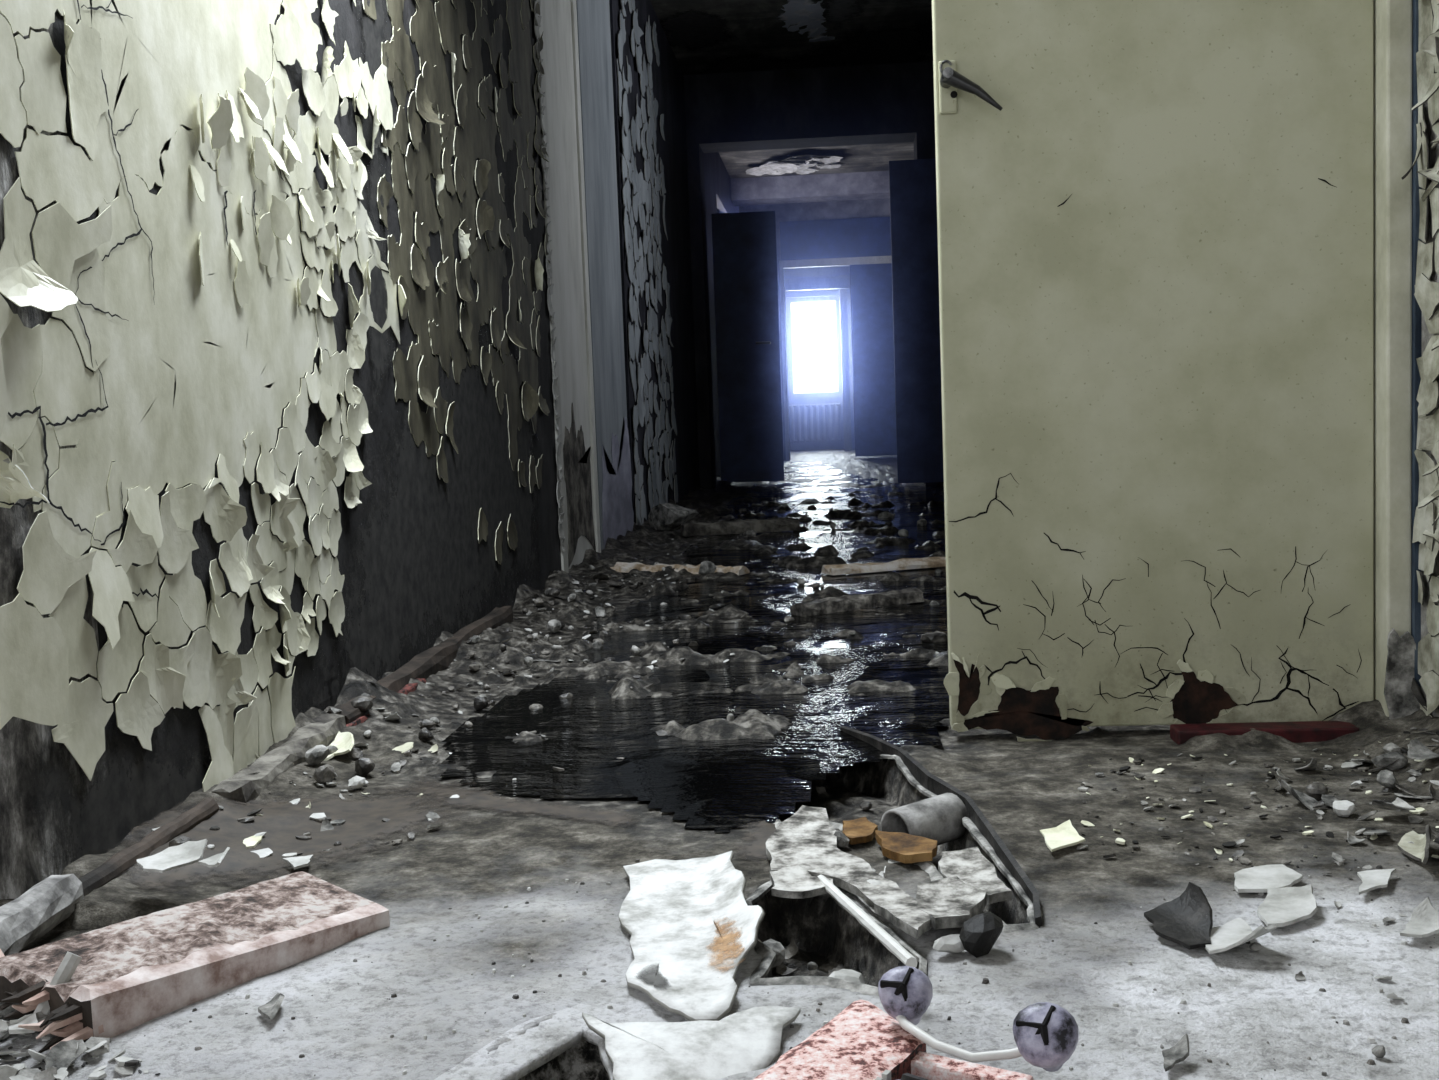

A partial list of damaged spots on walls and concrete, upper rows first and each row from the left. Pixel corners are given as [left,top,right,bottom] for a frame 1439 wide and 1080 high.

peeling [778,0,835,42]
crack [0,69,155,545]
peeling [0,0,678,792]
crack [949,473,1018,522]
crack [954,533,1362,721]
peeling [1384,0,1439,720]